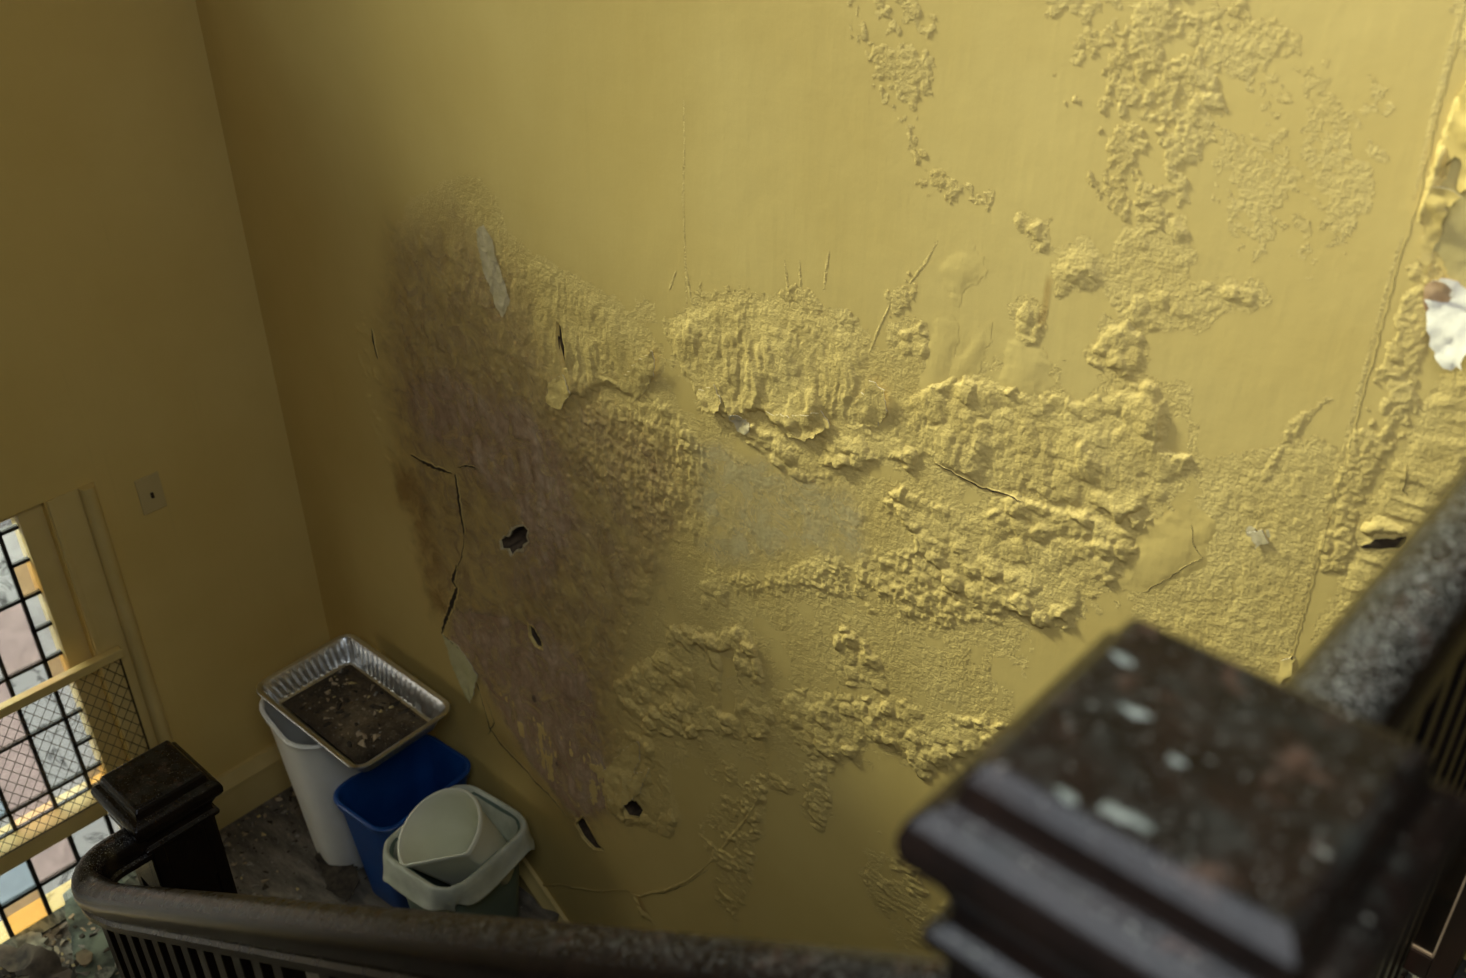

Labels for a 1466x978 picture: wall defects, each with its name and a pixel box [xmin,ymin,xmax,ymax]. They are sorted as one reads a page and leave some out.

crack [411,453,478,648]
water stain [395,250,658,680]
peeling [847,0,994,212]
peeling [1006,293,1048,347]
peeling [1043,0,1272,335]
peeling [1127,82,1466,683]